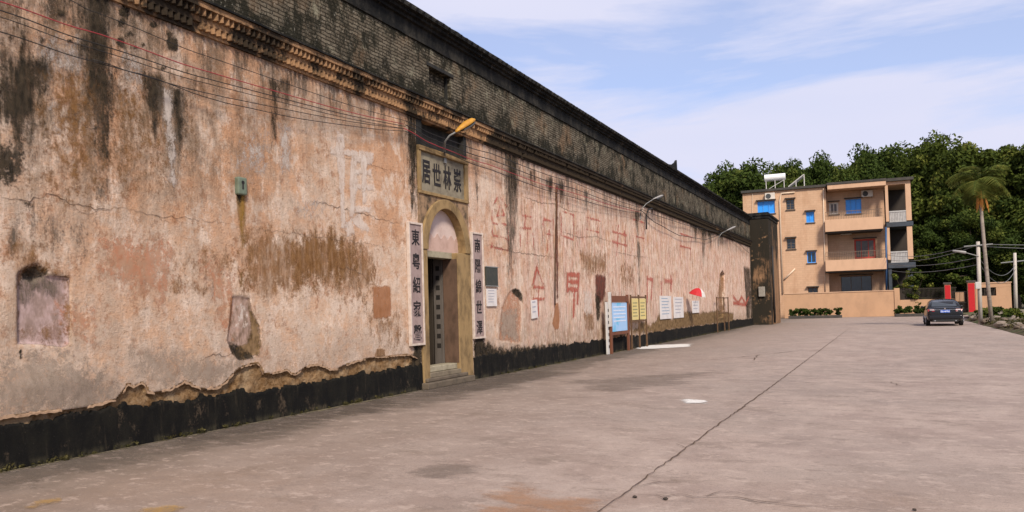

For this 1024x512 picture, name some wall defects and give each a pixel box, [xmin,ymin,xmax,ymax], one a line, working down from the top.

water stain [0,0,188,199]
water stain [10,202,82,252]
peeling [97,237,175,303]
corrosion [237,195,245,248]
water stain [194,224,376,298]
water stain [505,154,563,275]
spalling [0,252,418,426]
water stain [2,390,421,473]